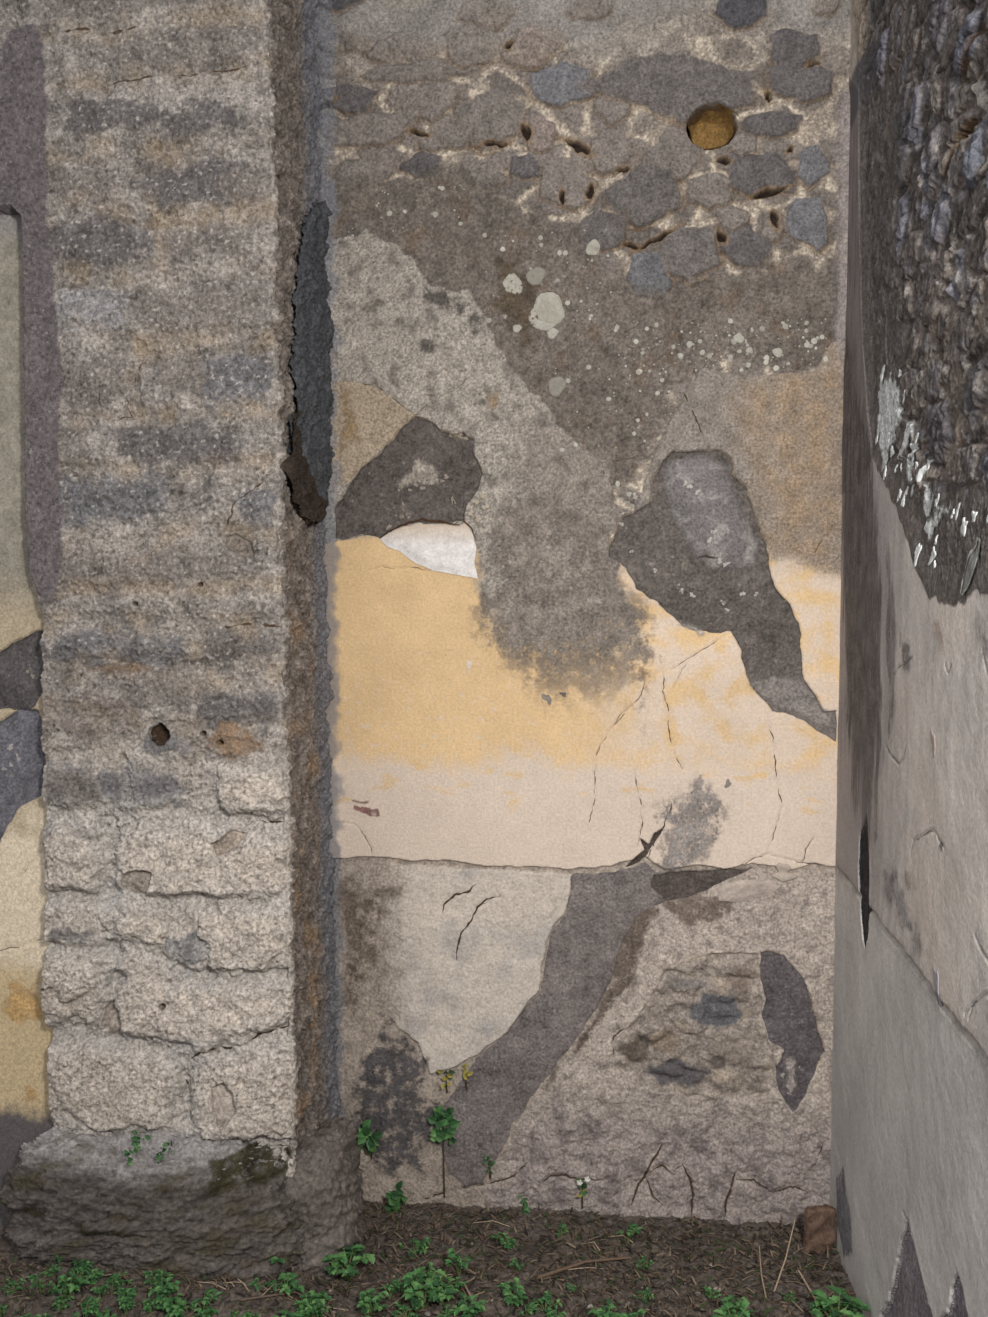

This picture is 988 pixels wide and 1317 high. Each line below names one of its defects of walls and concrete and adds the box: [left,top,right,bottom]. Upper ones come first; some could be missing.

spalling [281,201,490,579]
peeling [875,428,934,507]
peeling [950,502,988,537]
spalling [609,449,837,742]
crack [589,641,717,822]
crack [635,776,672,857]
crack [745,731,814,864]
leakage [340,880,400,1006]
crack [443,883,500,960]
spalling [439,828,825,1187]
leakage [353,1029,440,1175]
spalling [882,1223,968,1317]